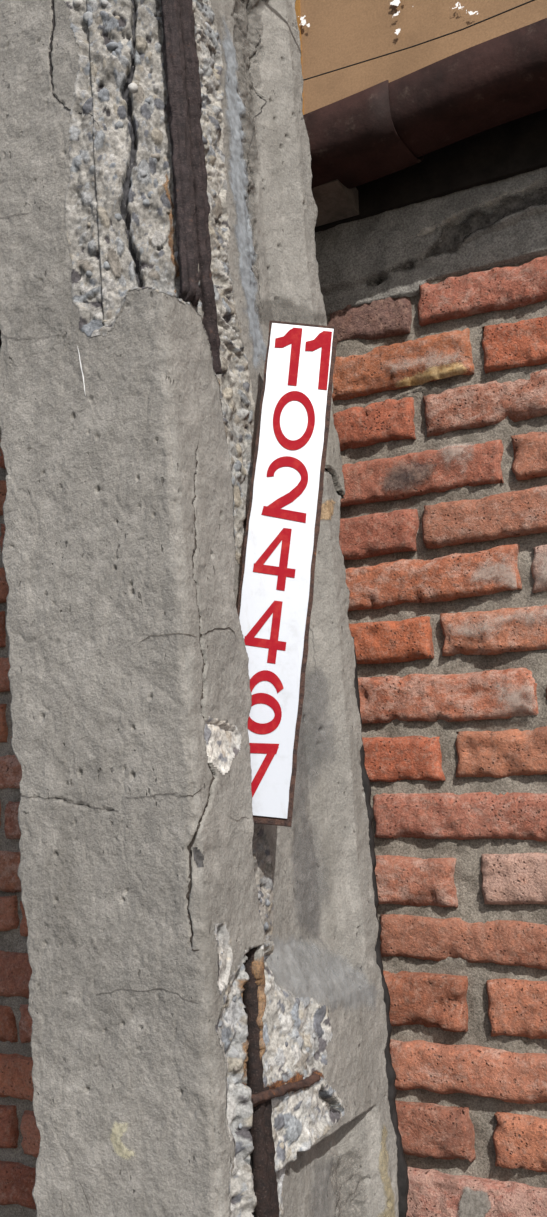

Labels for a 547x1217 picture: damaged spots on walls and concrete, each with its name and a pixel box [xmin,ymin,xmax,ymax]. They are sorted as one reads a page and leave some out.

crack [48,0,99,126]
crack [120,0,144,287]
spalling [64,0,255,566]
rust [163,175,180,294]
crack [138,442,235,719]
crack [21,763,247,951]
rust [239,957,266,1085]
spalling [214,823,345,1217]
rust [264,1070,324,1093]